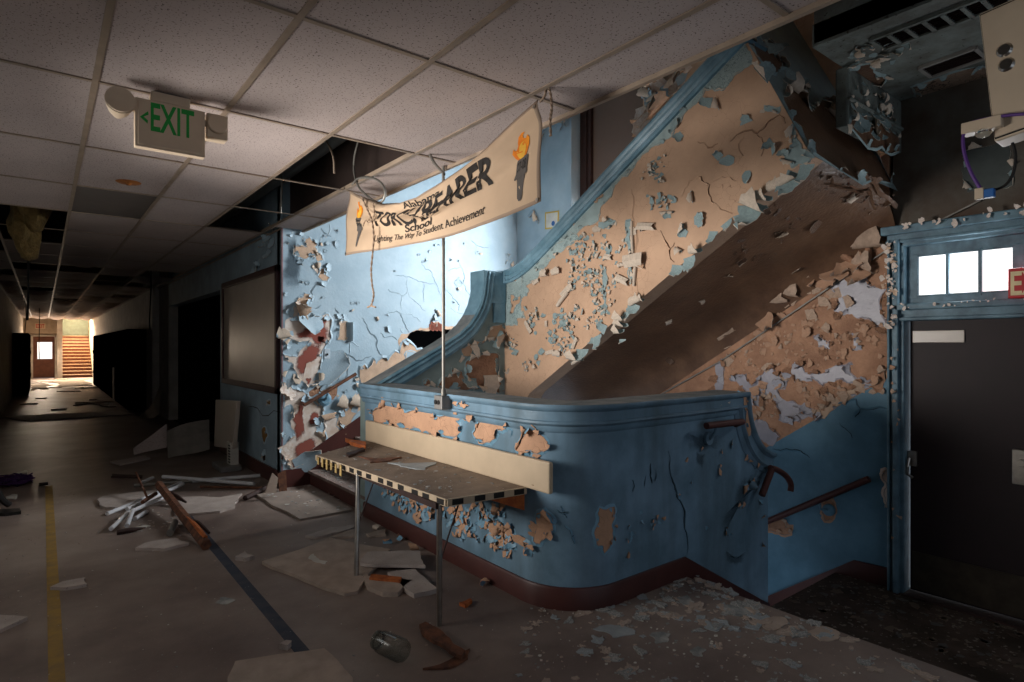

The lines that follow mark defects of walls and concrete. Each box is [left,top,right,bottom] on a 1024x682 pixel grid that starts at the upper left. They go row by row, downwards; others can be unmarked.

crack [681,114,786,214]
peeling [250,35,912,472]
peeling [901,217,965,229]
crack [337,240,488,382]
peeling [381,488,557,559]
crack [632,451,688,554]
peeling [759,499,794,547]